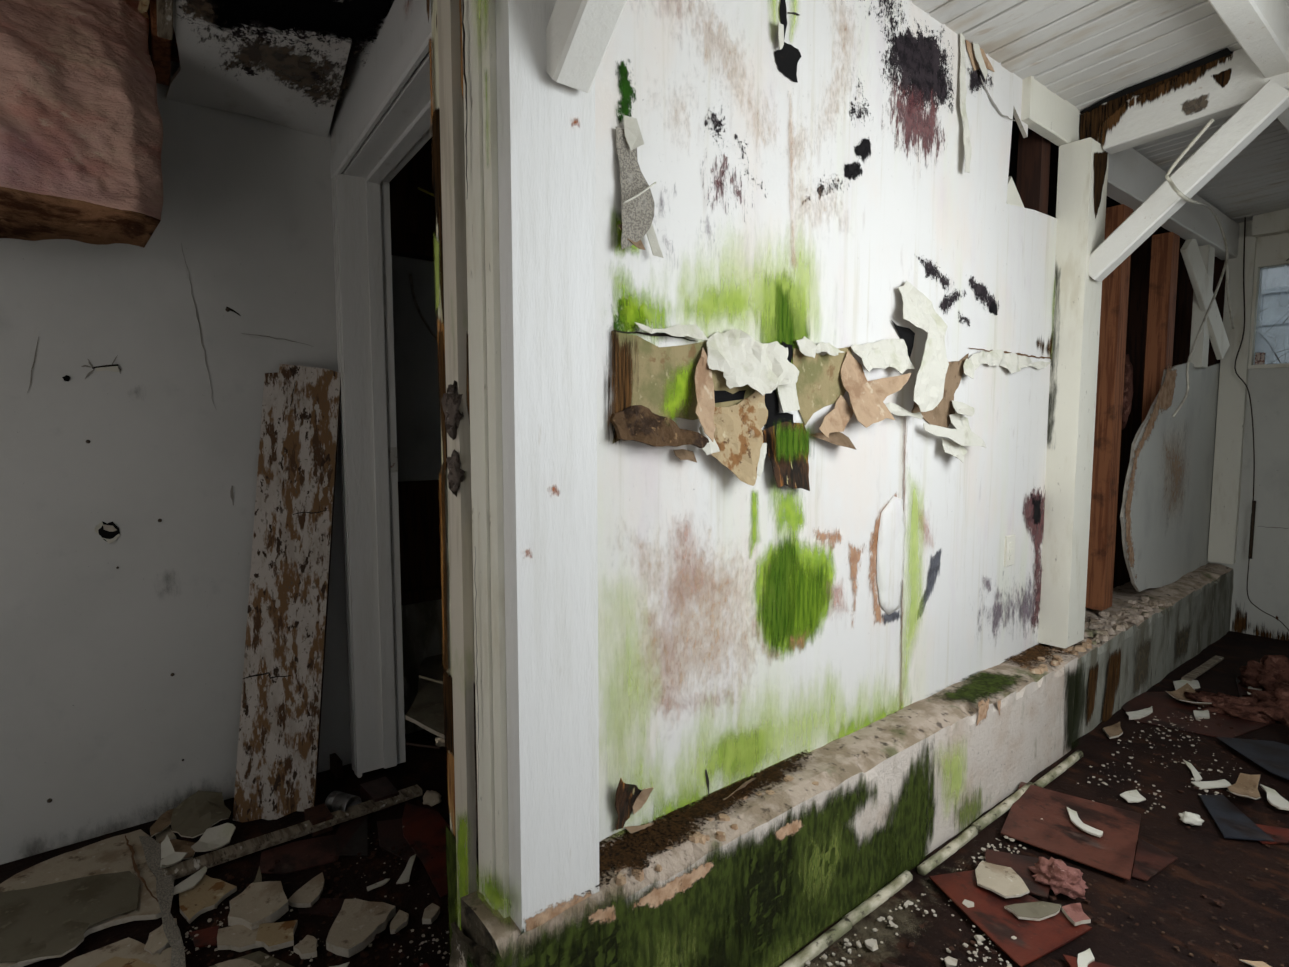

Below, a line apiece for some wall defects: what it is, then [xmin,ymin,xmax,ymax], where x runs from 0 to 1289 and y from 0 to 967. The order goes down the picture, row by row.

damp [173,0,394,107]
damp [802,0,954,206]
damp [698,254,809,323]
peeling [634,322,709,340]
peeling [95,522,120,543]
damp [750,421,810,653]
damp [817,510,941,624]
spalling [521,891,616,934]
spalling [632,862,713,910]
spalling [776,819,802,840]
damp [804,827,841,901]
damp [886,744,935,873]